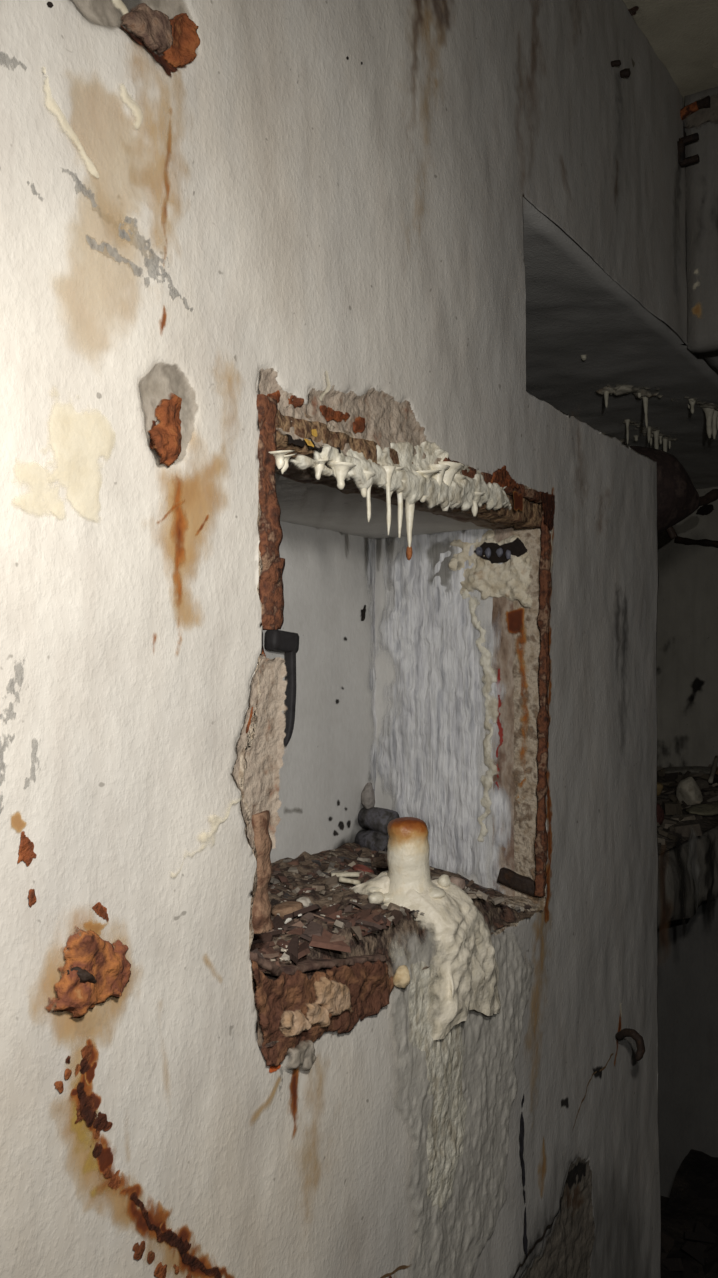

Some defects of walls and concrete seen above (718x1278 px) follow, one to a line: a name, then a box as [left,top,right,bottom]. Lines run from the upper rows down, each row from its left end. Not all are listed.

spalling [72,0,200,76]
spalling [140,362,198,466]
spalling [259,368,441,466]
rust [158,459,223,623]
spalling [199,654,287,849]
leakage [269,440,534,1278]
rust [55,1039,234,1278]
rust [253,1063,299,1136]
crack [513,1095,563,1278]
crack [561,1053,614,1131]